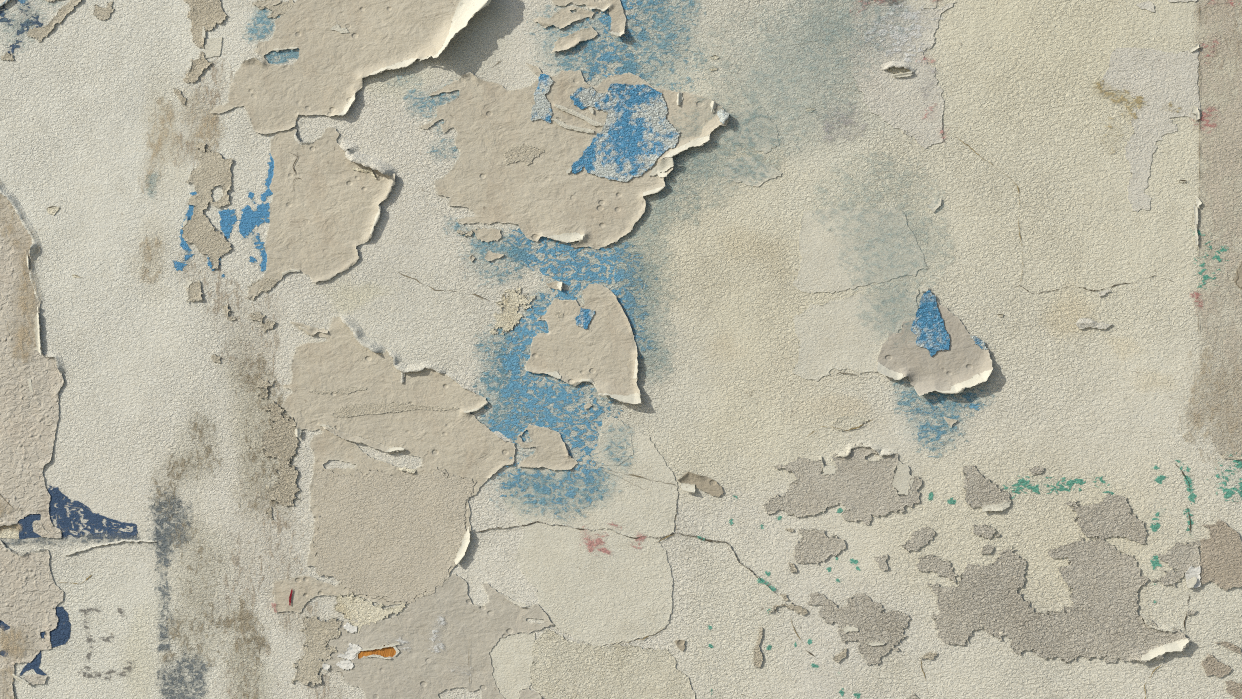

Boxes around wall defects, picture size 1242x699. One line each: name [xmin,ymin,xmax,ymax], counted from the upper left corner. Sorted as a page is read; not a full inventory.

peeling [174,0,227,105]
peeling [210,0,491,324]
peeling [419,62,729,262]
peeling [0,180,66,699]
peeling [260,310,578,699]
peeling [490,281,642,409]
crack [474,467,815,657]
peeling [768,592,910,665]
peeling [764,439,922,572]
peeling [876,287,993,396]
peeling [901,465,1242,664]
peeling [1201,641,1242,699]